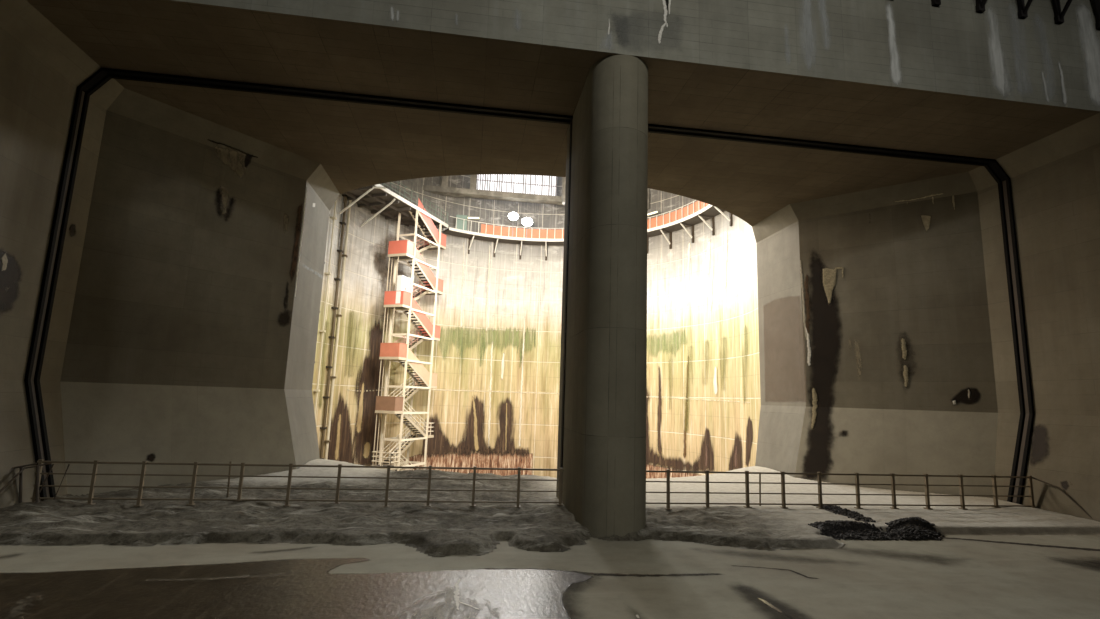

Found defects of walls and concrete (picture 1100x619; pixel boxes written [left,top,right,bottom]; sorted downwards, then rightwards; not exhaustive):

leakage [887,5,901,84]
leakage [988,10,1012,95]
leakage [1077,6,1100,104]
leakage [0,250,21,311]
leakage [375,238,402,292]
leakage [327,308,399,466]
leakage [415,300,557,457]
leakage [646,367,714,474]
leakage [678,355,750,413]
leakage [729,417,753,470]
leakage [803,254,861,480]
spalling [952,388,980,405]